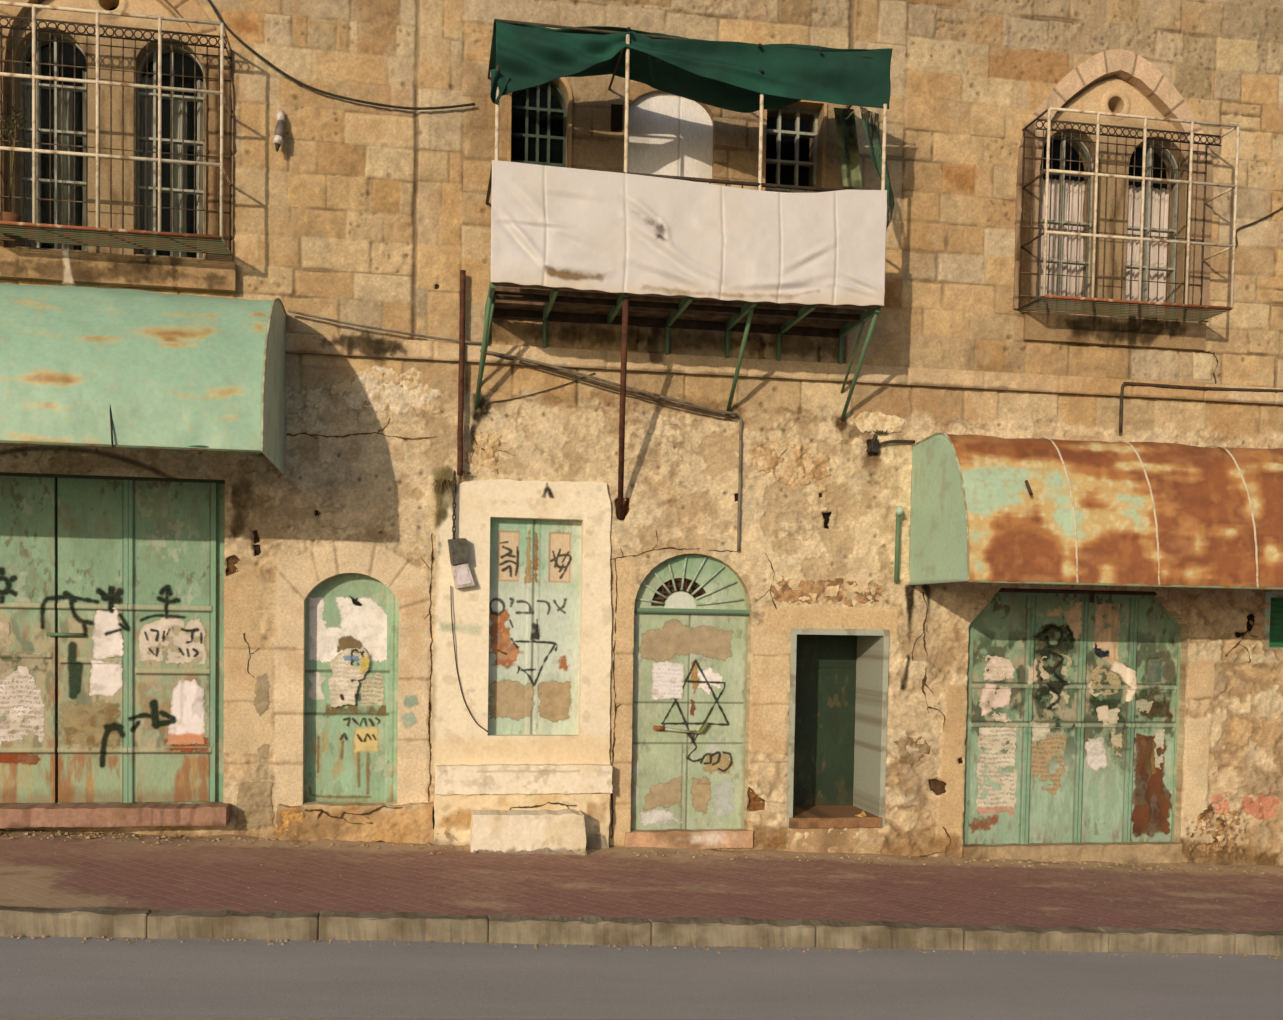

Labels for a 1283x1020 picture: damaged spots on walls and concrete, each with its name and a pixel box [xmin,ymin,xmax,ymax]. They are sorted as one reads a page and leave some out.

leakage [1066,314,1182,345]
peeling [336,365,441,415]
crack [287,418,437,440]
peeling [770,578,886,607]
crack [912,591,946,731]
rust [0,753,40,765]
rust [1131,700,1172,837]
spalling [1199,792,1281,844]